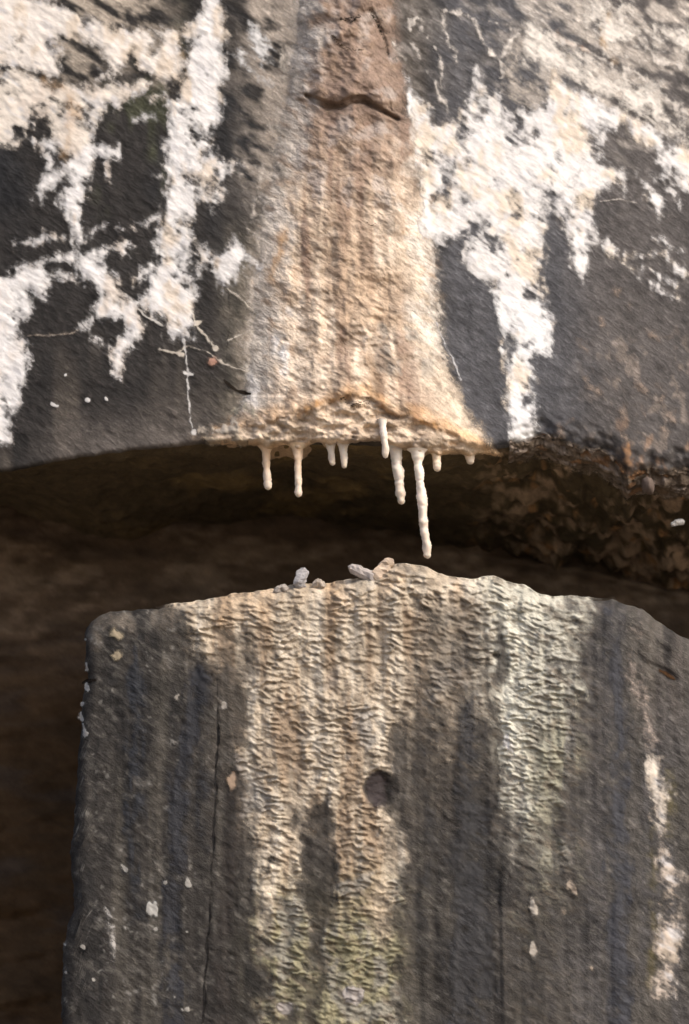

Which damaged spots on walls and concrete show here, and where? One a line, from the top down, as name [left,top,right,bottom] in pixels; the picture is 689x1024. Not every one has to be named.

damp [0,0,689,466]
spalling [508,434,689,500]
crack [210,671,220,872]
damp [160,563,611,1024]
damp [602,637,658,1024]
damp [645,757,669,827]
damp [654,849,681,895]
crack [202,903,212,1023]
damp [651,916,684,999]